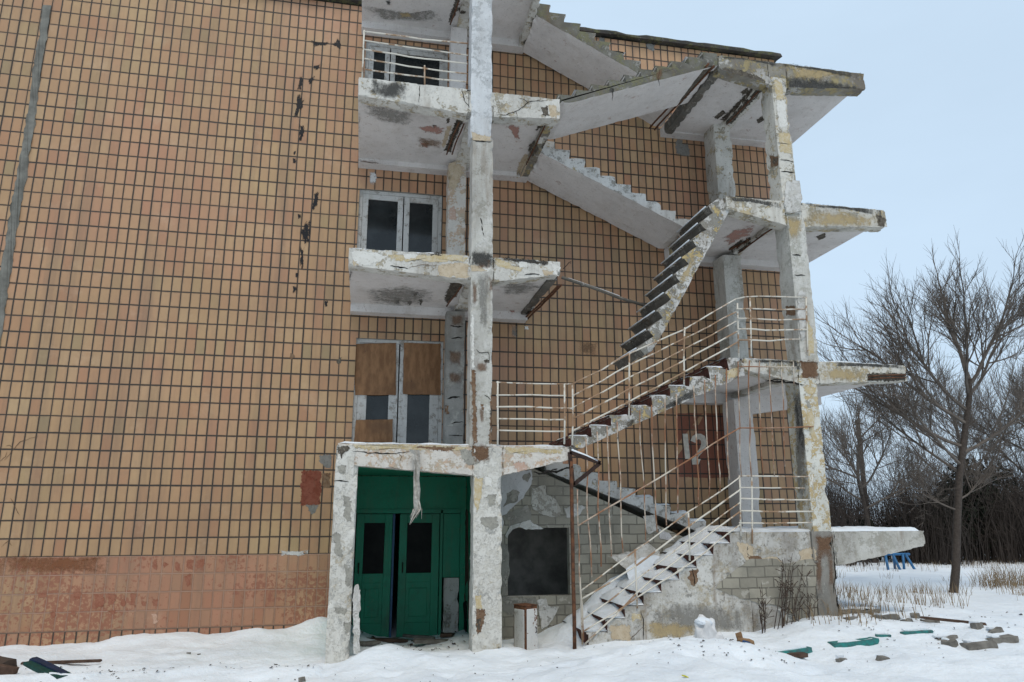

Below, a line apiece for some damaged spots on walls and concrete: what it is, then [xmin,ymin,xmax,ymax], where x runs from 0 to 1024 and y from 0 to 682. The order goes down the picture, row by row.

water stain [369,79,408,124]
spalling [421,118,465,190]
spalling [509,104,558,178]
peeling [649,63,793,167]
peeling [783,180,803,222]
spalling [725,226,773,254]
peeling [786,290,814,356]
peeling [300,315,585,634]
water stain [3,558,102,572]